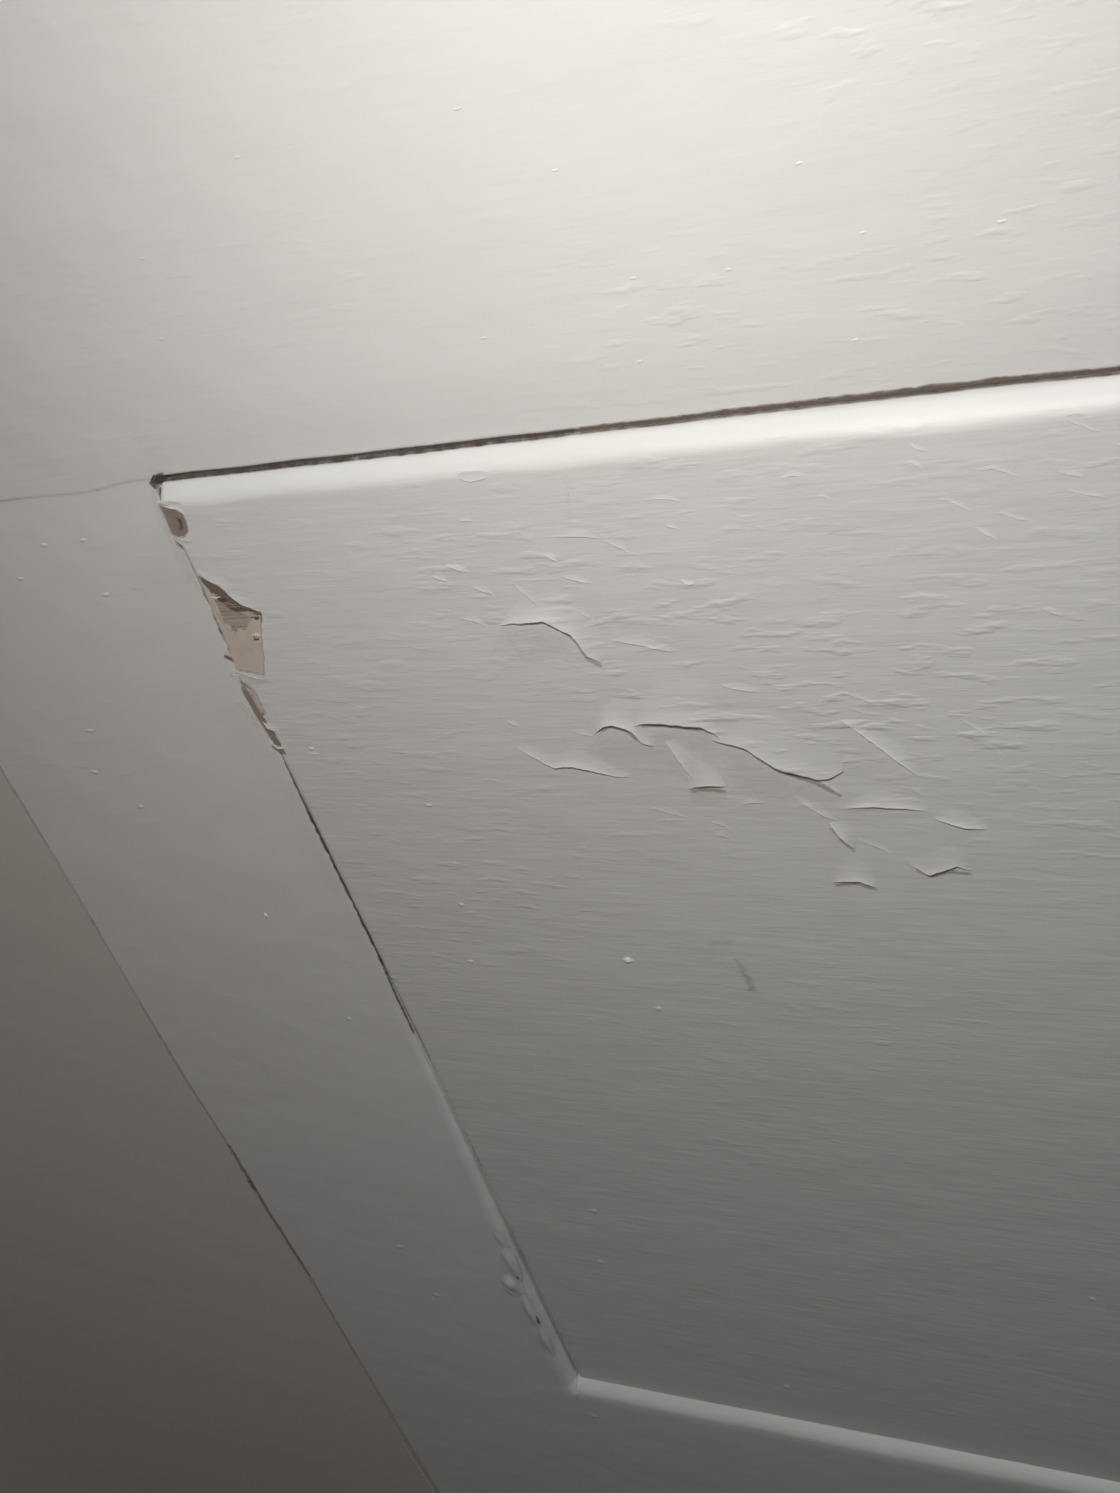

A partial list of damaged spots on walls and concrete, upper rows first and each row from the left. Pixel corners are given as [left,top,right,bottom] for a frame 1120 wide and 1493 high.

spalling [156,501,192,546]
spalling [197,570,288,754]
peeling [507,679,988,888]